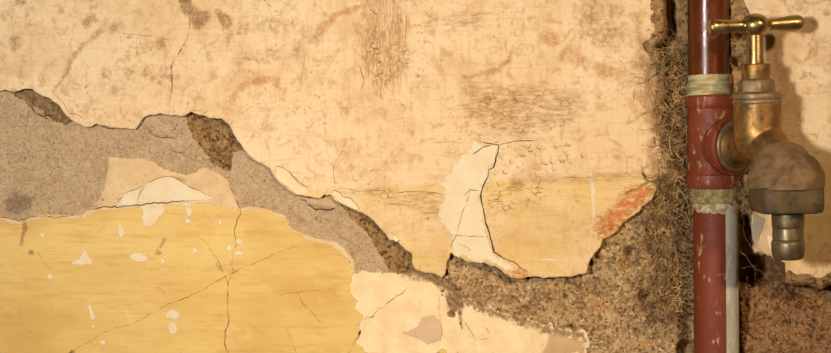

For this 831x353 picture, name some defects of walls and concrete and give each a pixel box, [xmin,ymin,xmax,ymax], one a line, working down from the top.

crack [0,82,119,149]
crack [122,22,222,153]
spalling [643,0,688,180]
spalling [729,32,747,94]
spalling [729,0,749,20]
crack [96,176,197,209]
crack [69,188,300,353]
spalling [0,89,694,353]
crack [277,94,572,279]
rust [598,187,653,236]
spalling [738,165,831,353]